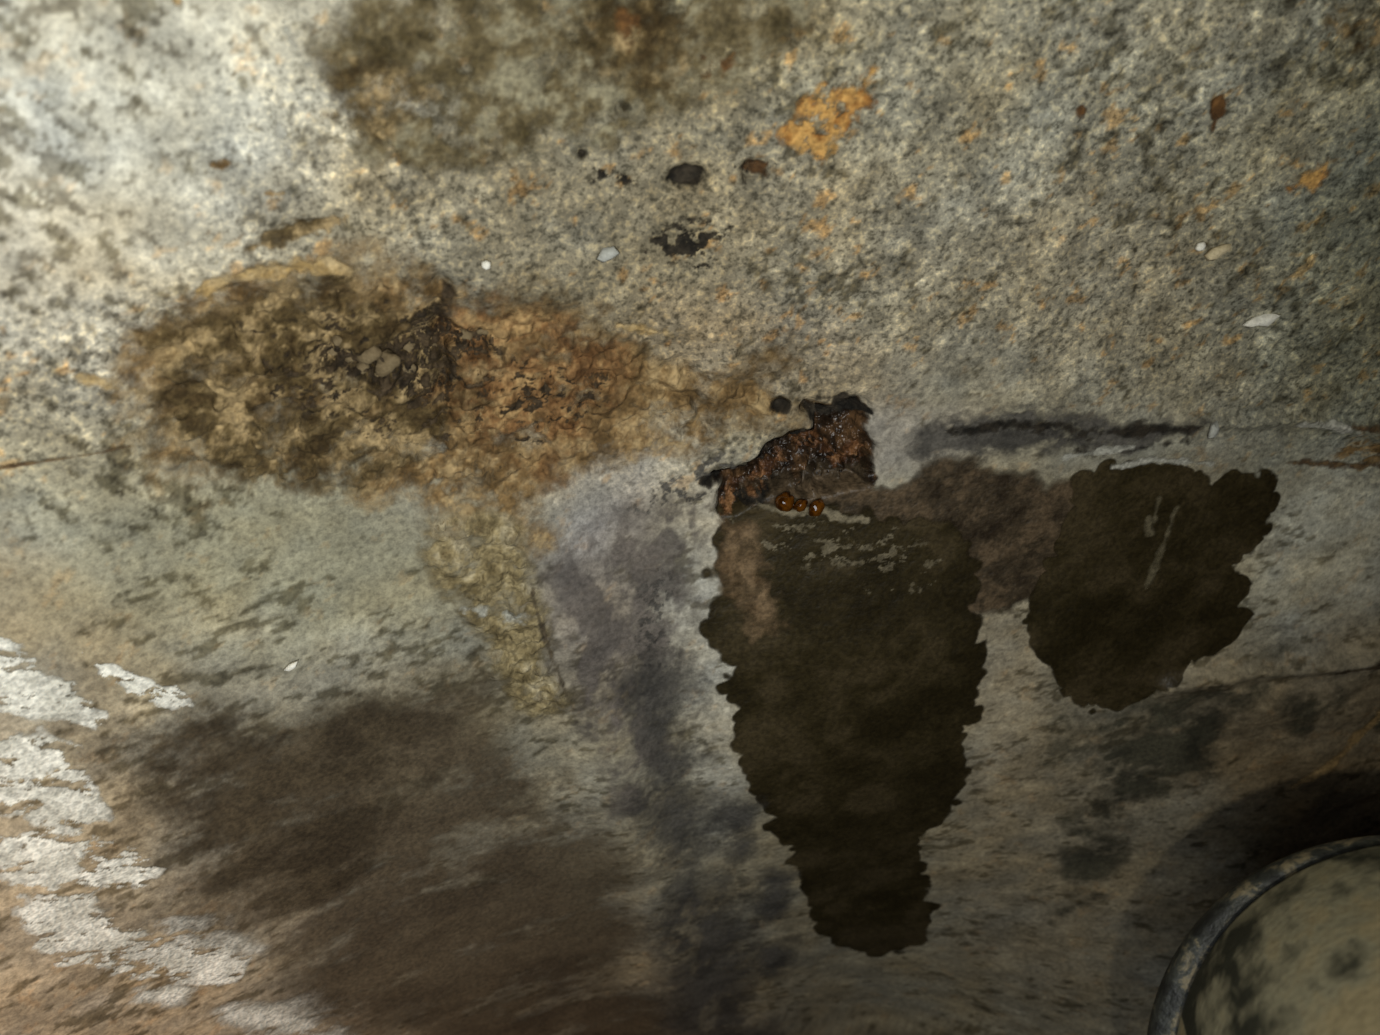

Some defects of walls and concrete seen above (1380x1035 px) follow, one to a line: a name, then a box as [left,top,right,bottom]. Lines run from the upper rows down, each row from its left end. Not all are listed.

leakage [306,0,809,169]
leakage [591,167,637,185]
leakage [644,218,734,269]
rust [777,68,878,160]
spalling [76,216,878,551]
leakage [0,406,1281,1035]